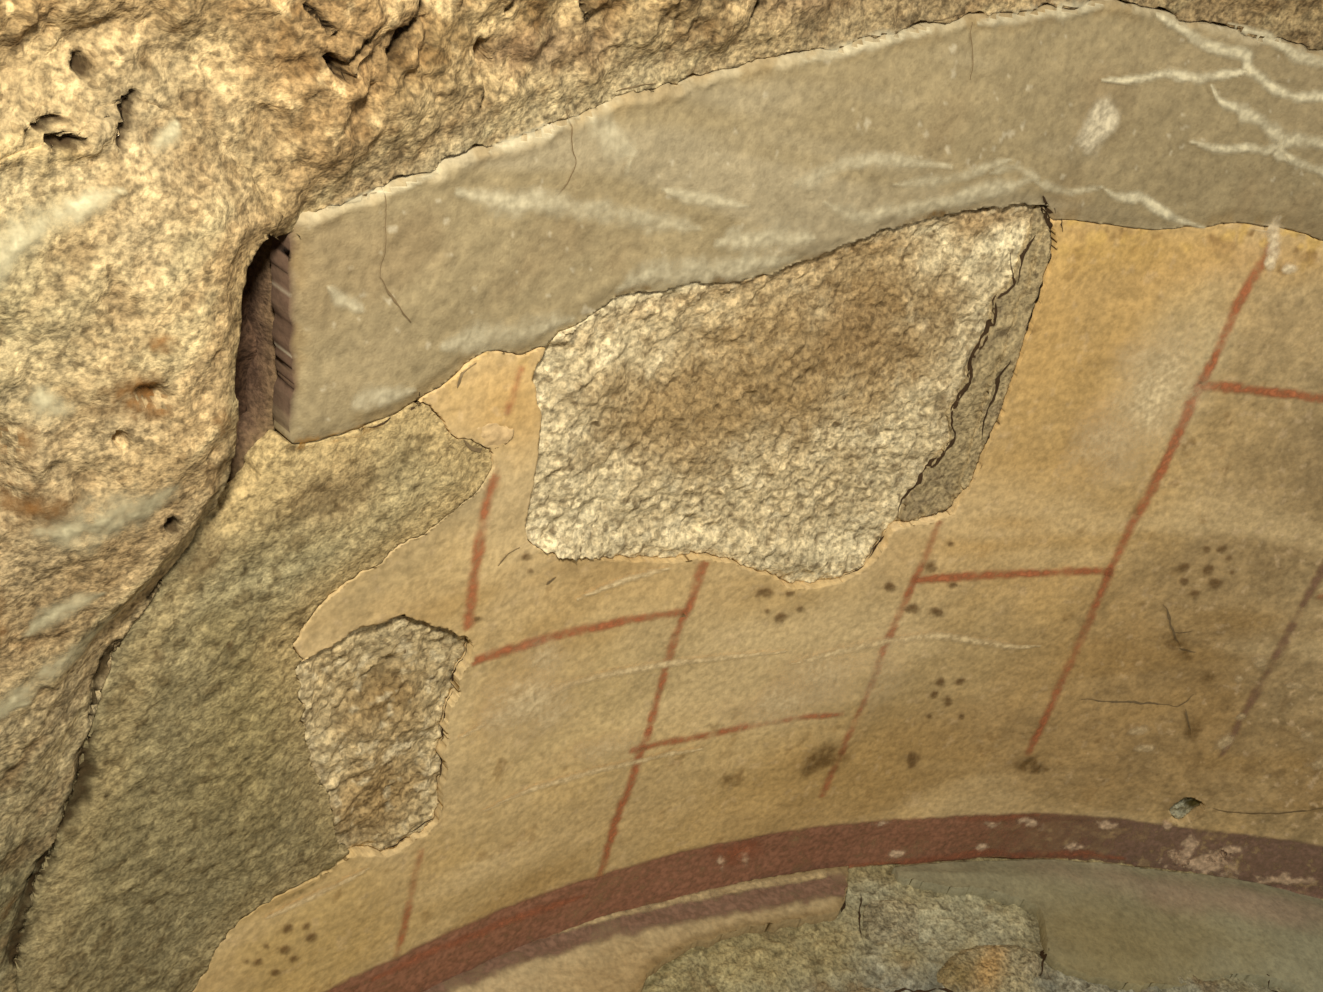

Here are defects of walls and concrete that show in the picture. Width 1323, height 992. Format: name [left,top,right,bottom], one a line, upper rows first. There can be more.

water stain [1077,99,1119,153]
spalling [525,203,1052,583]
spalling [295,614,468,851]